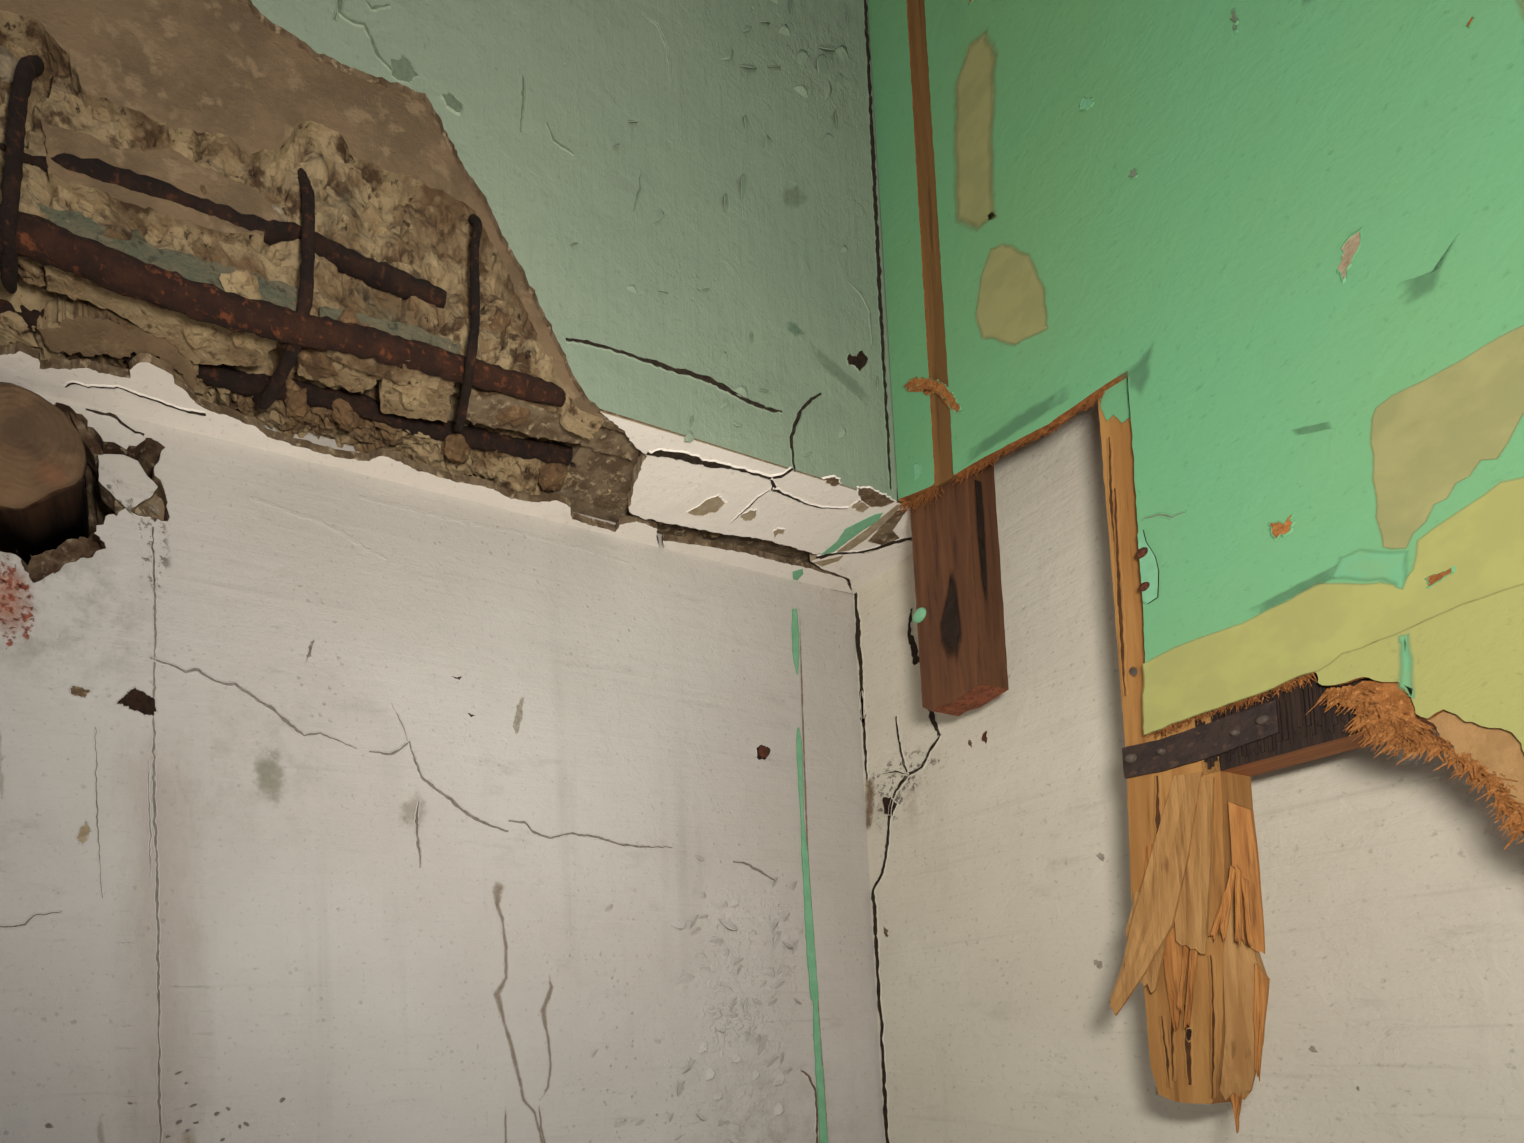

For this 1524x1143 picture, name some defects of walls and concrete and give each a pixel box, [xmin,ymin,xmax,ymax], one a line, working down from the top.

spalling [0,0,639,495]
rust [0,559,34,646]
spalling [1,402,170,583]
crack [566,337,849,524]
crack [816,536,912,559]
crack [0,910,63,929]
crack [93,727,105,899]
crack [146,526,673,1143]
crack [853,592,942,1143]